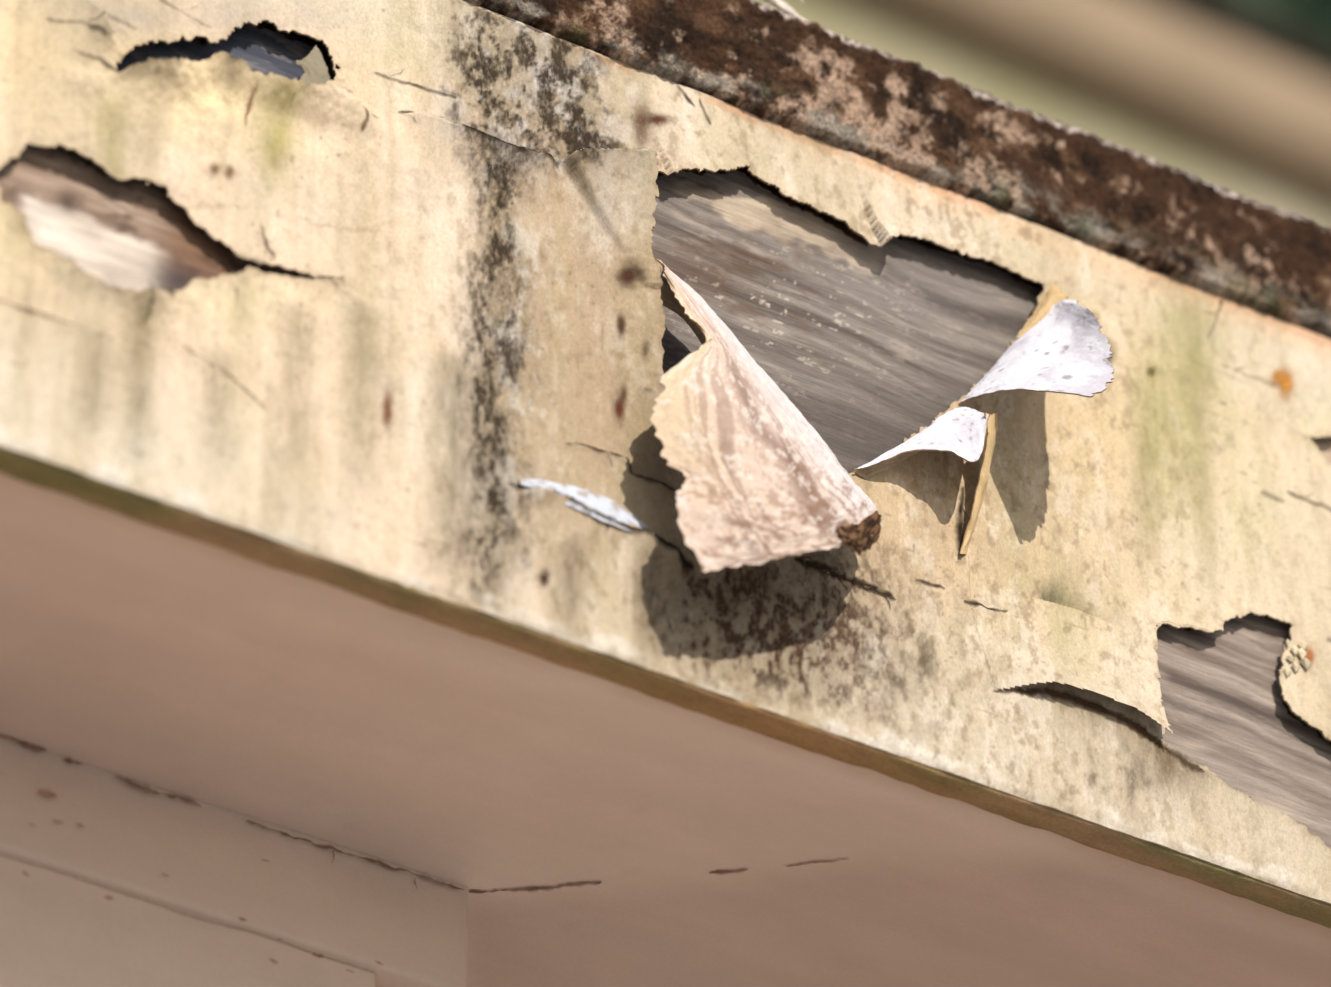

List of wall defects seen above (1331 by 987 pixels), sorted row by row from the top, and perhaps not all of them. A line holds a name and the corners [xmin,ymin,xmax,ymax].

peeling [116,24,334,85]
crack [362,72,560,167]
peeling [0,145,306,295]
damp [452,9,621,591]
peeling [650,170,1115,573]
rust [1274,371,1292,392]
peeling [1311,437,1331,462]
crack [958,488,969,556]
damp [661,559,887,697]
crack [794,557,1007,612]
peeling [1156,613,1331,849]
crack [247,820,602,893]